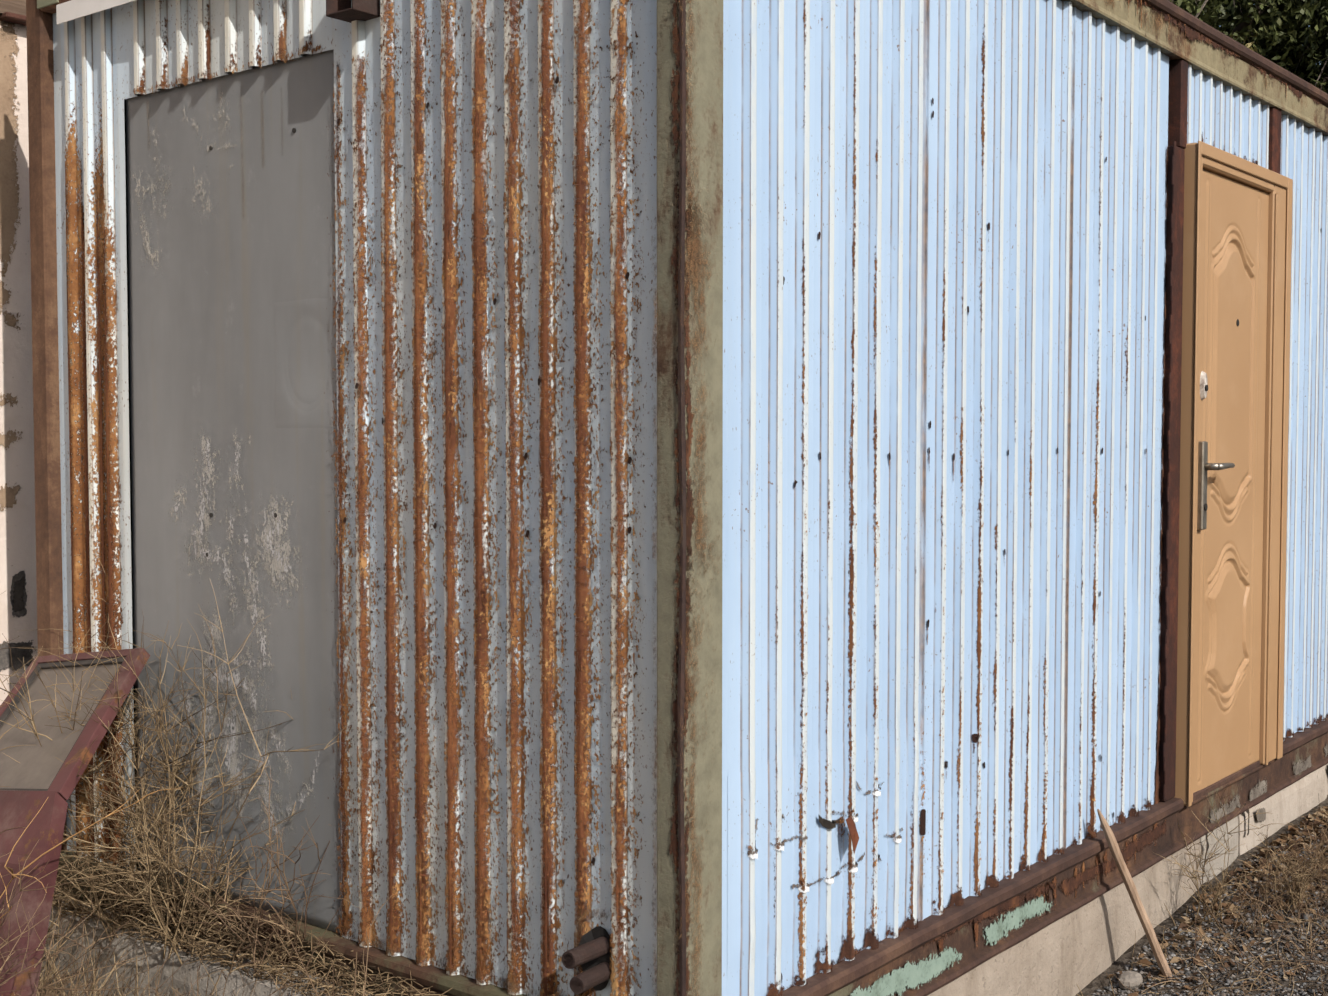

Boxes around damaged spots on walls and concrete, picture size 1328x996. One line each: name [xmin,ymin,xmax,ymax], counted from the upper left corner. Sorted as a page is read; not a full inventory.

rust [133,1,322,94]
rust [1107,0,1326,105]
peeling [0,20,22,333]
peeling [0,392,18,407]
peeling [0,428,23,450]
rust [65,103,123,653]
peeling [0,483,22,511]
rust [766,8,1167,996]
rust [1283,714,1328,742]
rust [74,704,127,867]
peeling [983,895,1053,946]
peeling [851,946,963,996]